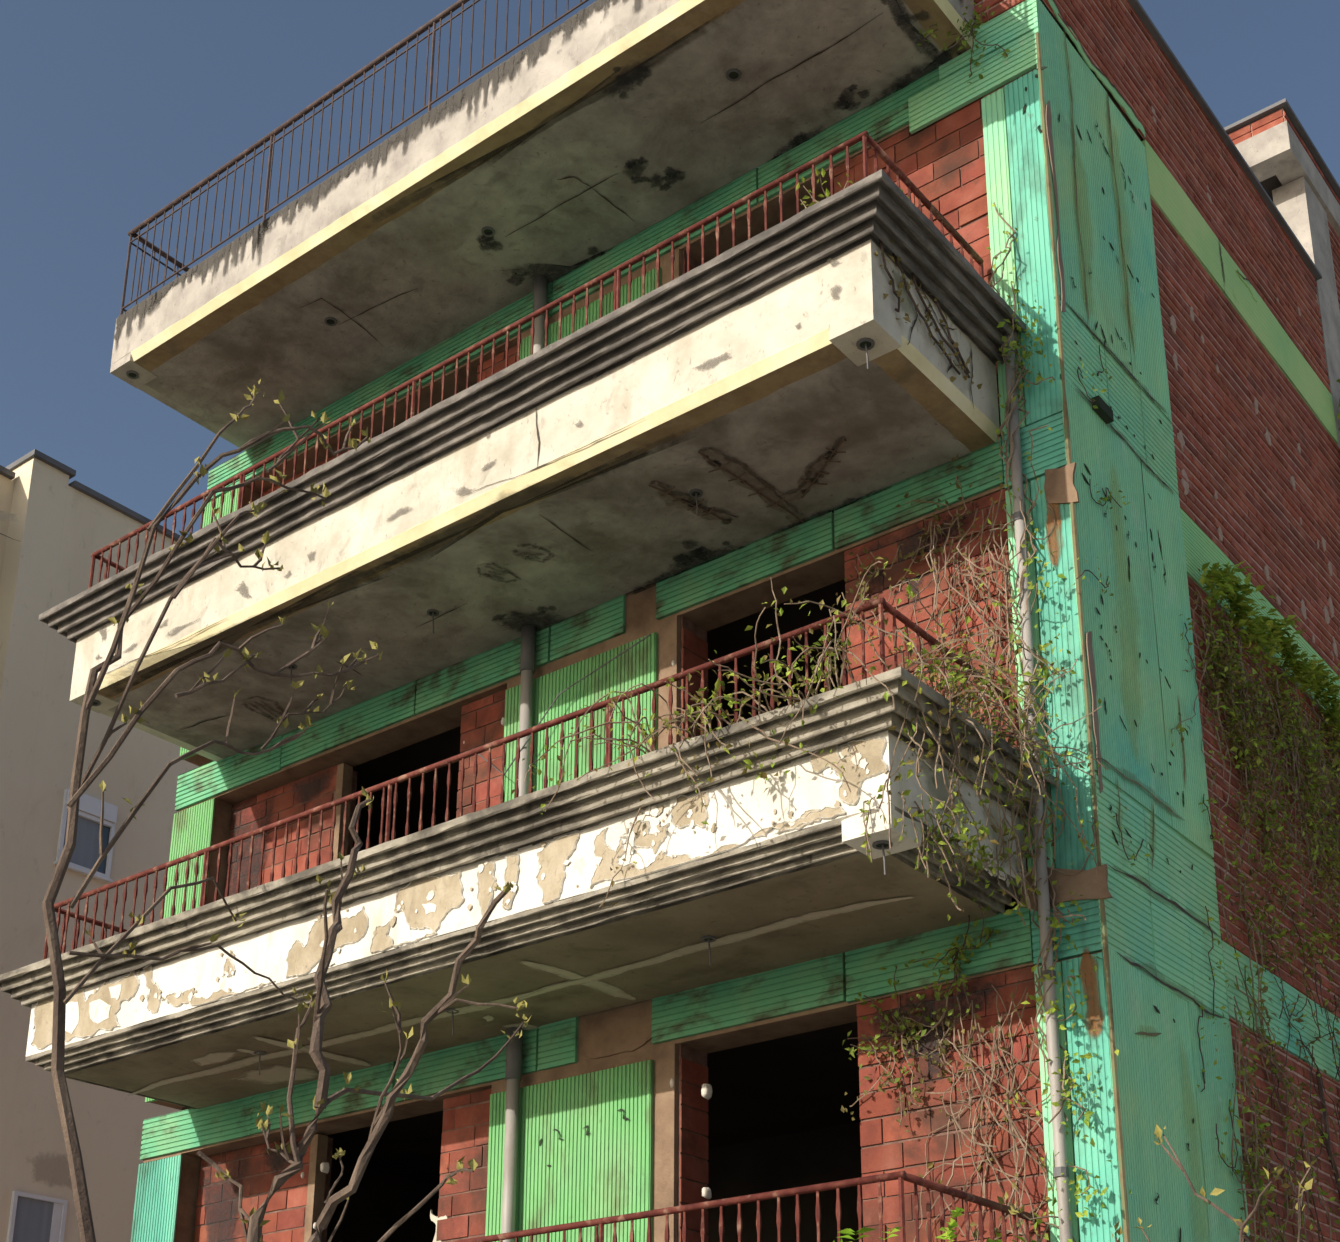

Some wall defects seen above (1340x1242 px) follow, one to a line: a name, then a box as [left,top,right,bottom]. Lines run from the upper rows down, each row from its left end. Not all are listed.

damp [114,0,642,348]
damp [391,28,703,212]
crack [700,13,882,124]
damp [772,130,820,160]
peeling [1044,462,1166,585]
peeling [536,737,888,904]
peeling [31,854,520,1050]
damp [261,1140,301,1173]